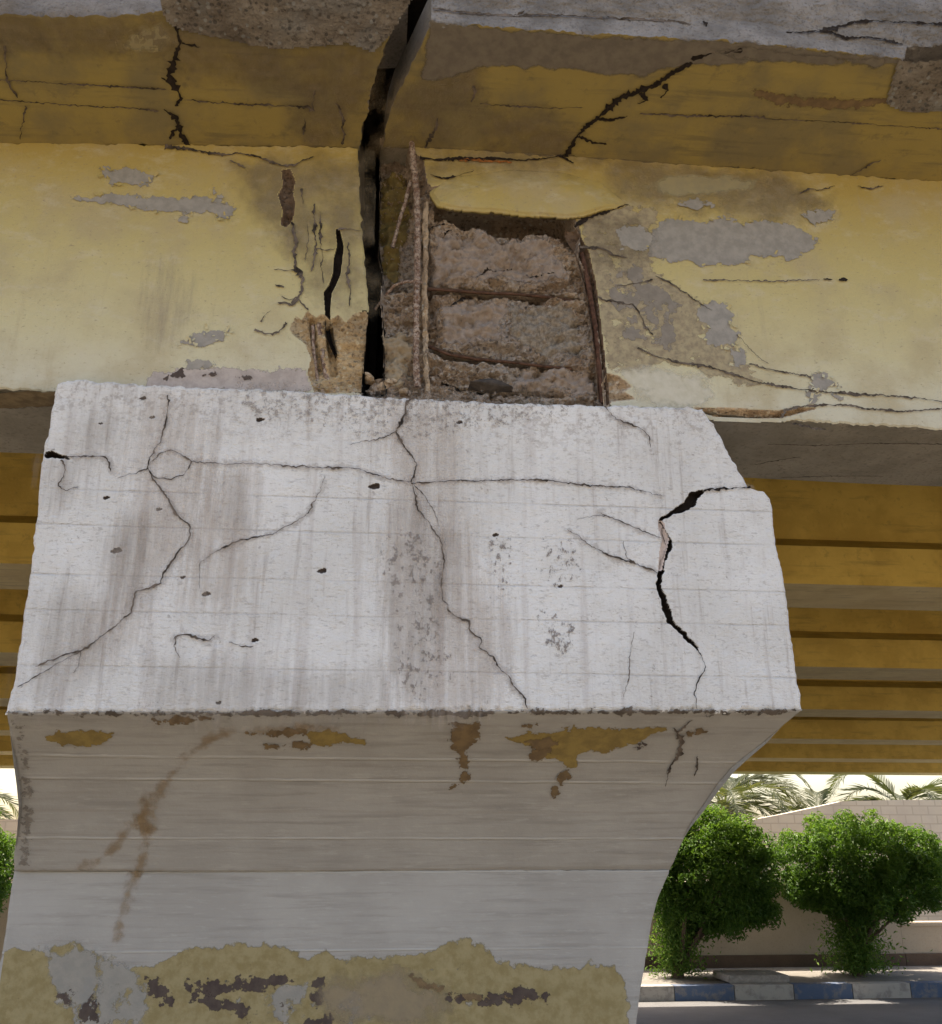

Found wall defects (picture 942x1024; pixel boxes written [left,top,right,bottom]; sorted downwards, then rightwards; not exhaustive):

crack [420,48,942,179]
peeling [70,165,236,223]
crack [0,26,358,359]
spalling [146,141,836,407]
crack [18,276,942,787]
peeling [45,729,114,747]
peeling [245,727,367,750]
peeling [447,721,481,790]
peeling [505,723,667,799]
peeling [0,937,631,1024]